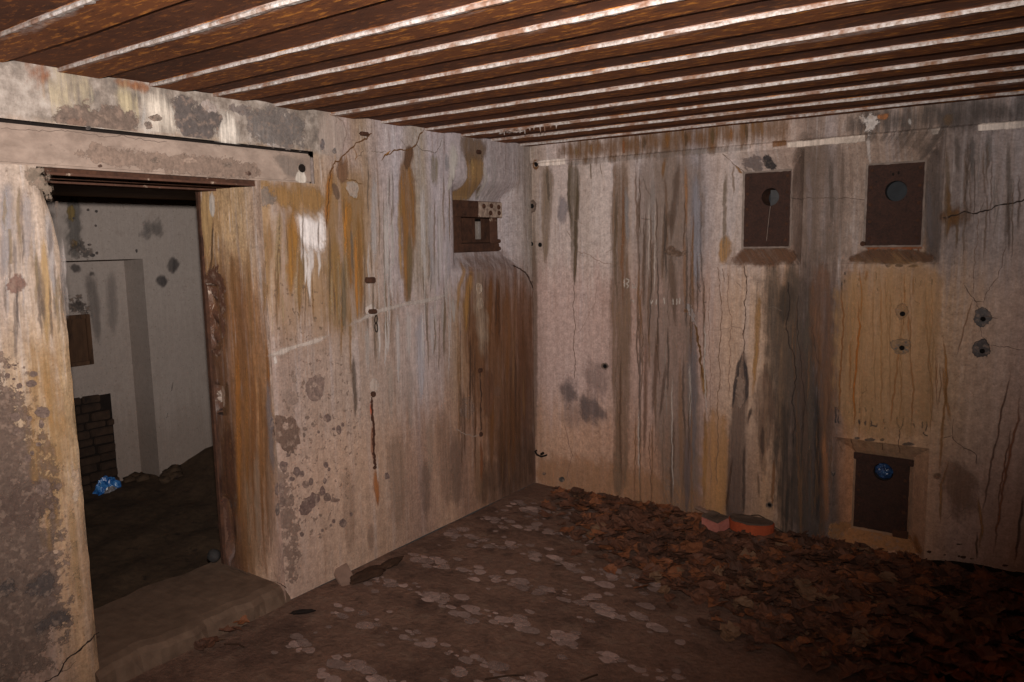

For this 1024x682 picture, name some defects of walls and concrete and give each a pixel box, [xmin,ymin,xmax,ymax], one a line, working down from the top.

spalling [52,95,305,180]
corrosion [204,262,236,358]
damp [295,212,326,295]
crack [326,114,442,227]
corrosion [398,147,415,302]
corrosion [452,137,486,200]
damp [533,152,706,511]
spalling [972,307,993,358]
crack [942,191,1024,350]
corrosion [222,350,272,548]
corrosion [370,397,379,503]
damp [726,262,922,555]